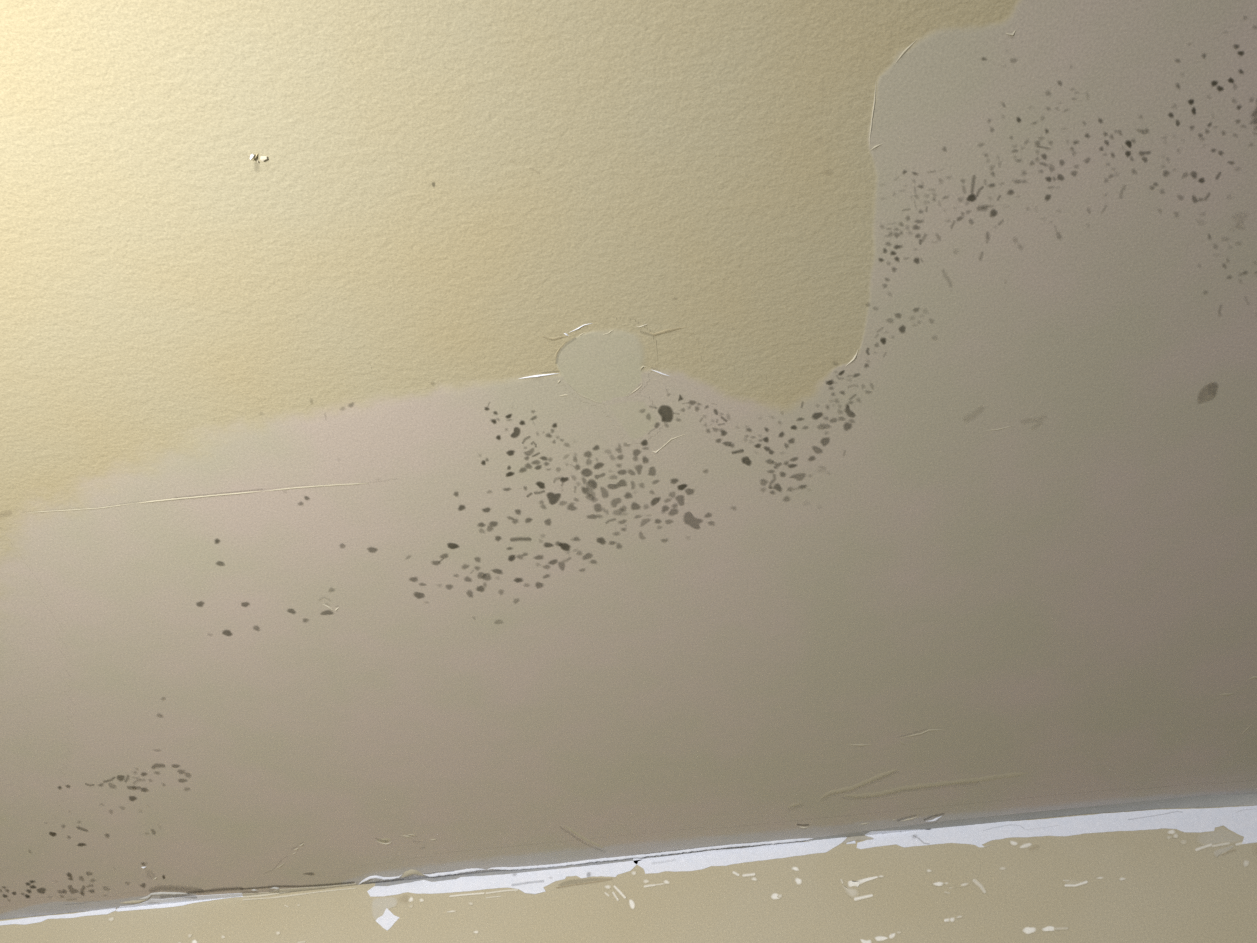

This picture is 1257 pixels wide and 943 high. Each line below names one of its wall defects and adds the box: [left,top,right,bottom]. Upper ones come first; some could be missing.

damp [659,396,682,421]
damp [485,408,524,476]
damp [732,426,796,465]
damp [536,457,568,504]
peeling [367,805,1257,931]